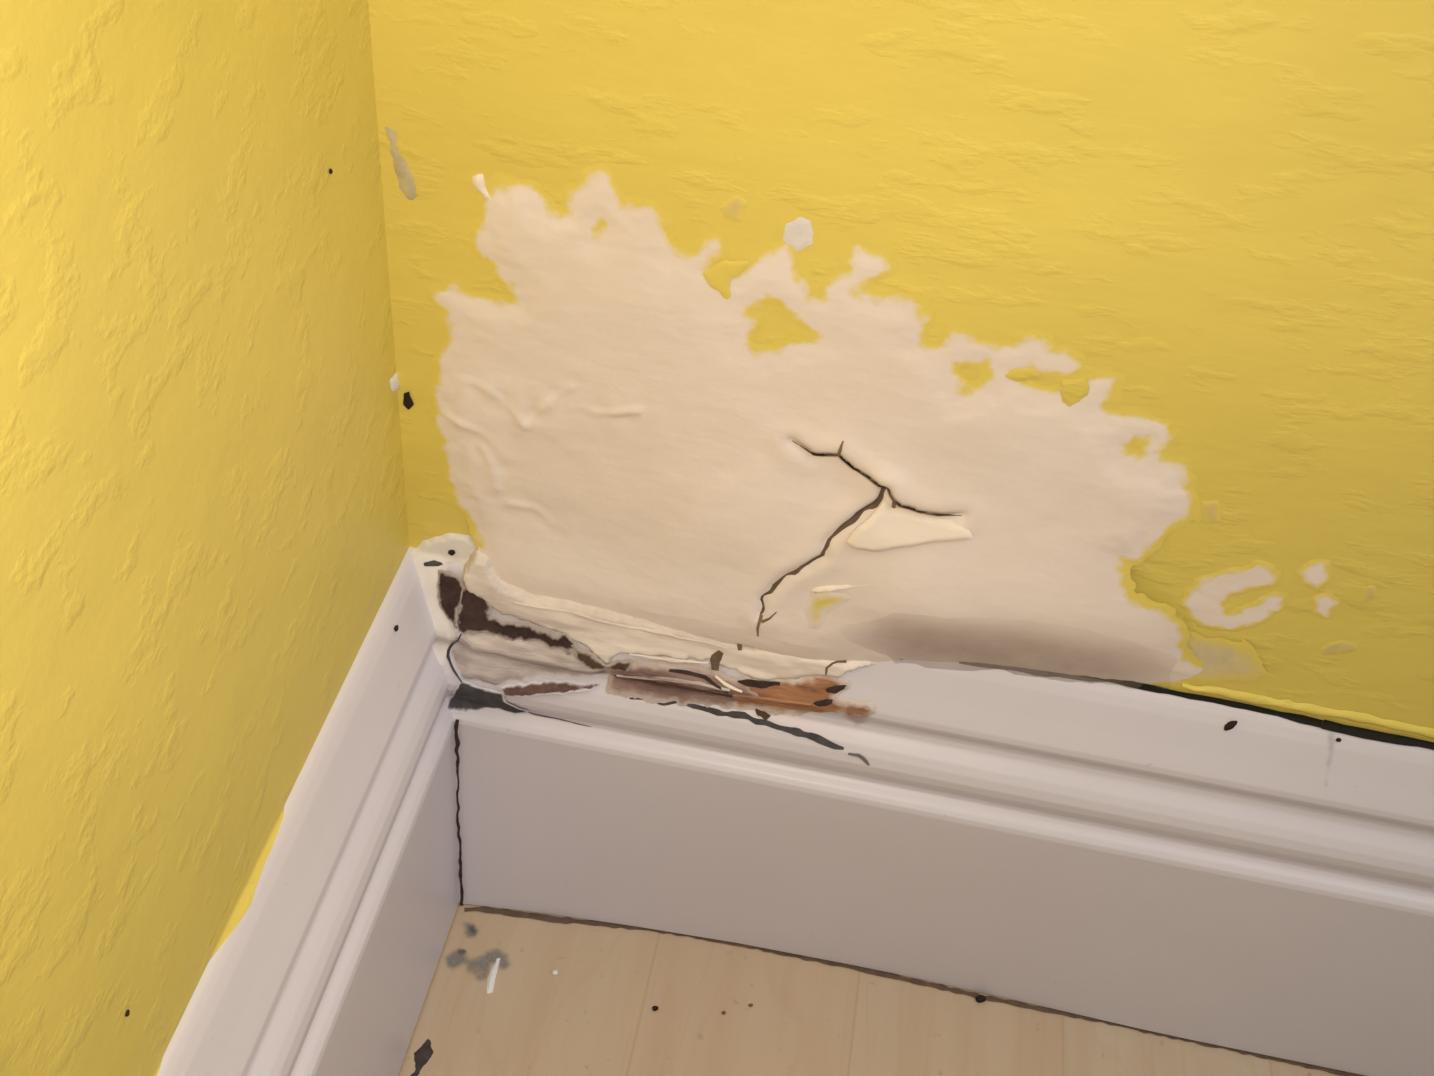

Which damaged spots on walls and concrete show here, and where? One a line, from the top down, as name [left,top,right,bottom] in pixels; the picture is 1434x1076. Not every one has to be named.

peeling [412,163,1341,687]
crack [630,697,869,766]
crack [710,441,962,671]
crack [825,660,847,675]